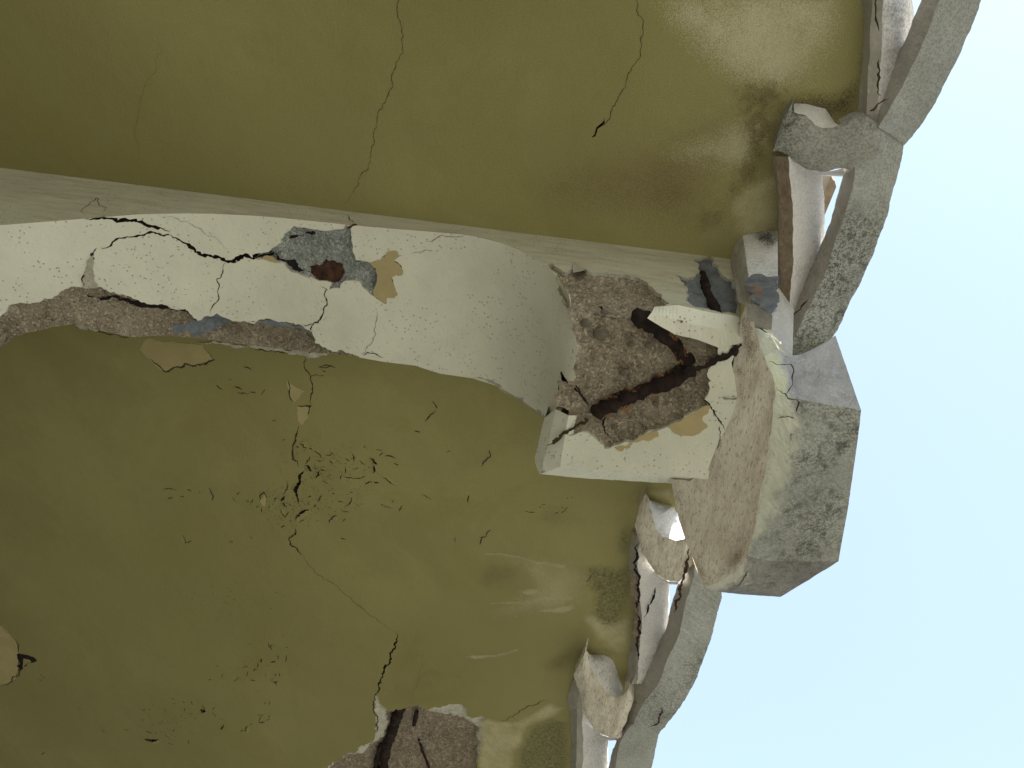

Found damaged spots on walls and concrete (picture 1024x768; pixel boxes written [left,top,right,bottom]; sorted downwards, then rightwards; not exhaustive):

crack [345,0,404,229]
crack [592,0,644,137]
crack [81,198,274,311]
spalling [0,287,356,372]
spalling [255,226,403,304]
spalling [549,262,718,452]
spalling [681,259,780,315]
crack [292,427,304,502]
peeling [0,626,37,686]
crack [288,529,398,733]
crack [633,544,689,660]
spalling [328,695,489,768]